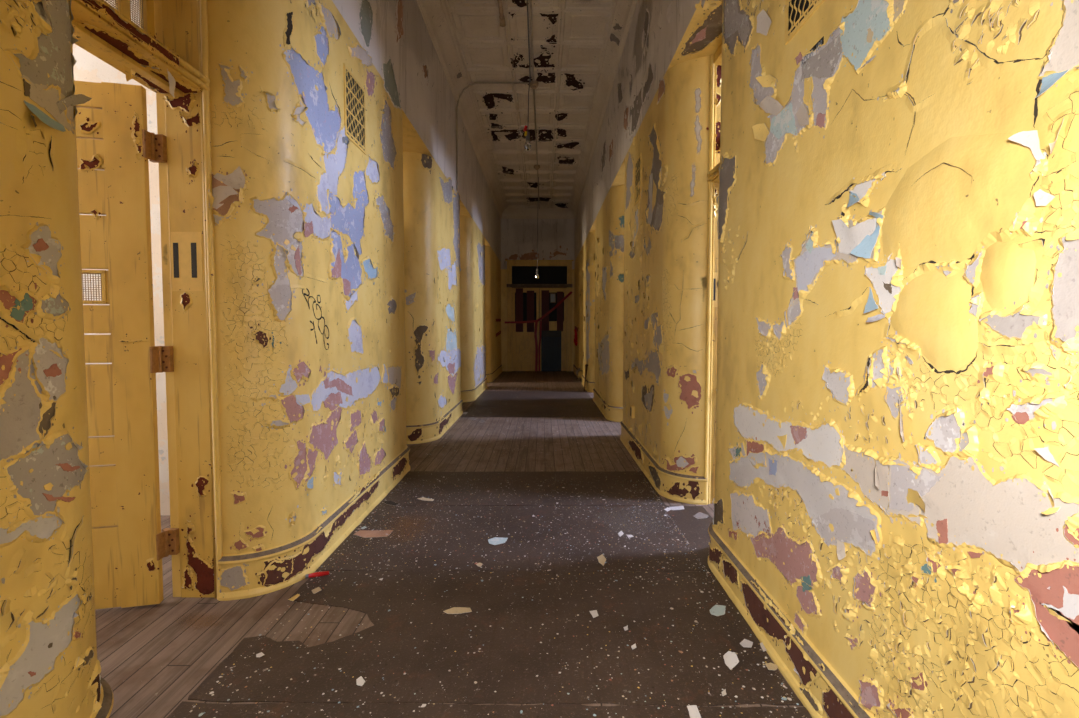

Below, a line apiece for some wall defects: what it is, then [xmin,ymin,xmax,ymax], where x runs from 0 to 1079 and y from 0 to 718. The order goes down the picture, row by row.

crack [49,136,58,174]
peeling [0,0,202,134]
peeling [509,0,585,92]
peeling [677,0,908,168]
peeling [949,0,1079,99]
peeling [0,222,71,327]
peeling [179,0,487,598]
crack [825,0,1079,489]
peeling [0,335,89,557]
spalling [578,64,1079,718]
peeling [0,568,102,718]
crack [867,534,1079,718]